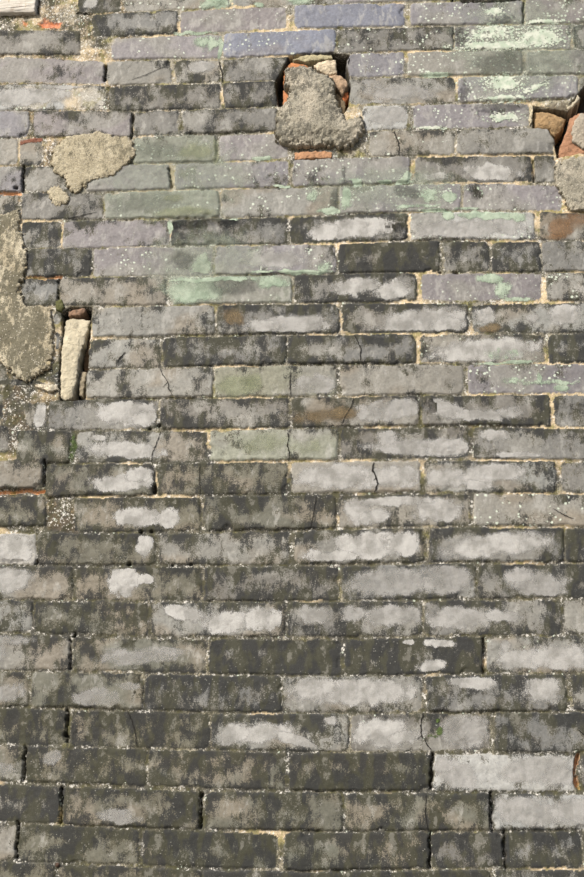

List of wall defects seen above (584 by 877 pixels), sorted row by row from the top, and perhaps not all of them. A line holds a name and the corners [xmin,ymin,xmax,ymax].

spalling [283,54,349,114]
peeling [533,101,584,212]
peeling [0,209,92,401]